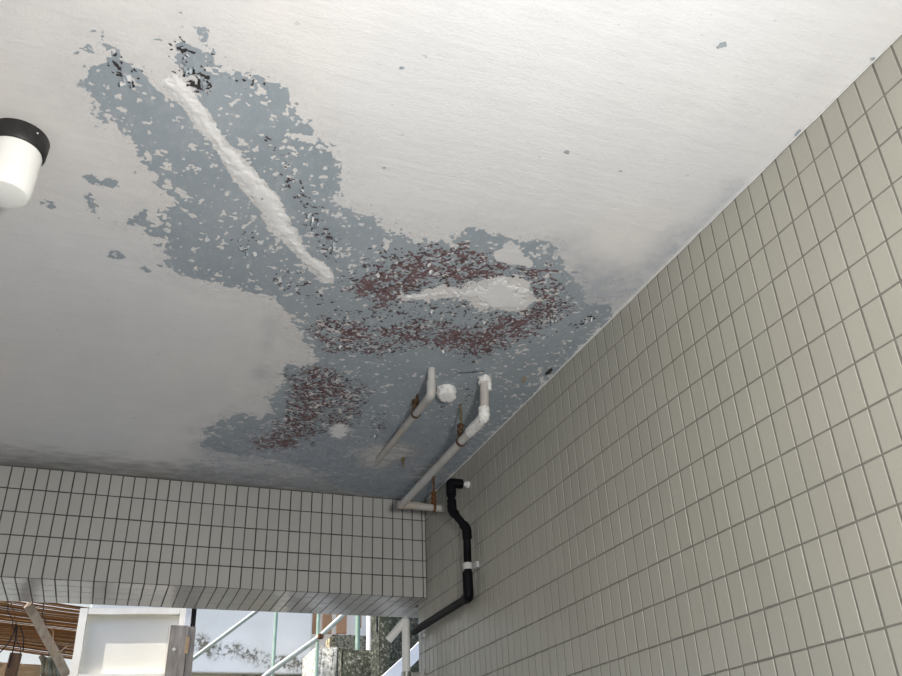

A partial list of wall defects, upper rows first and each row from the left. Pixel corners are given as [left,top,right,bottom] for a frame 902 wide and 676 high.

peeling [73,26,617,501]